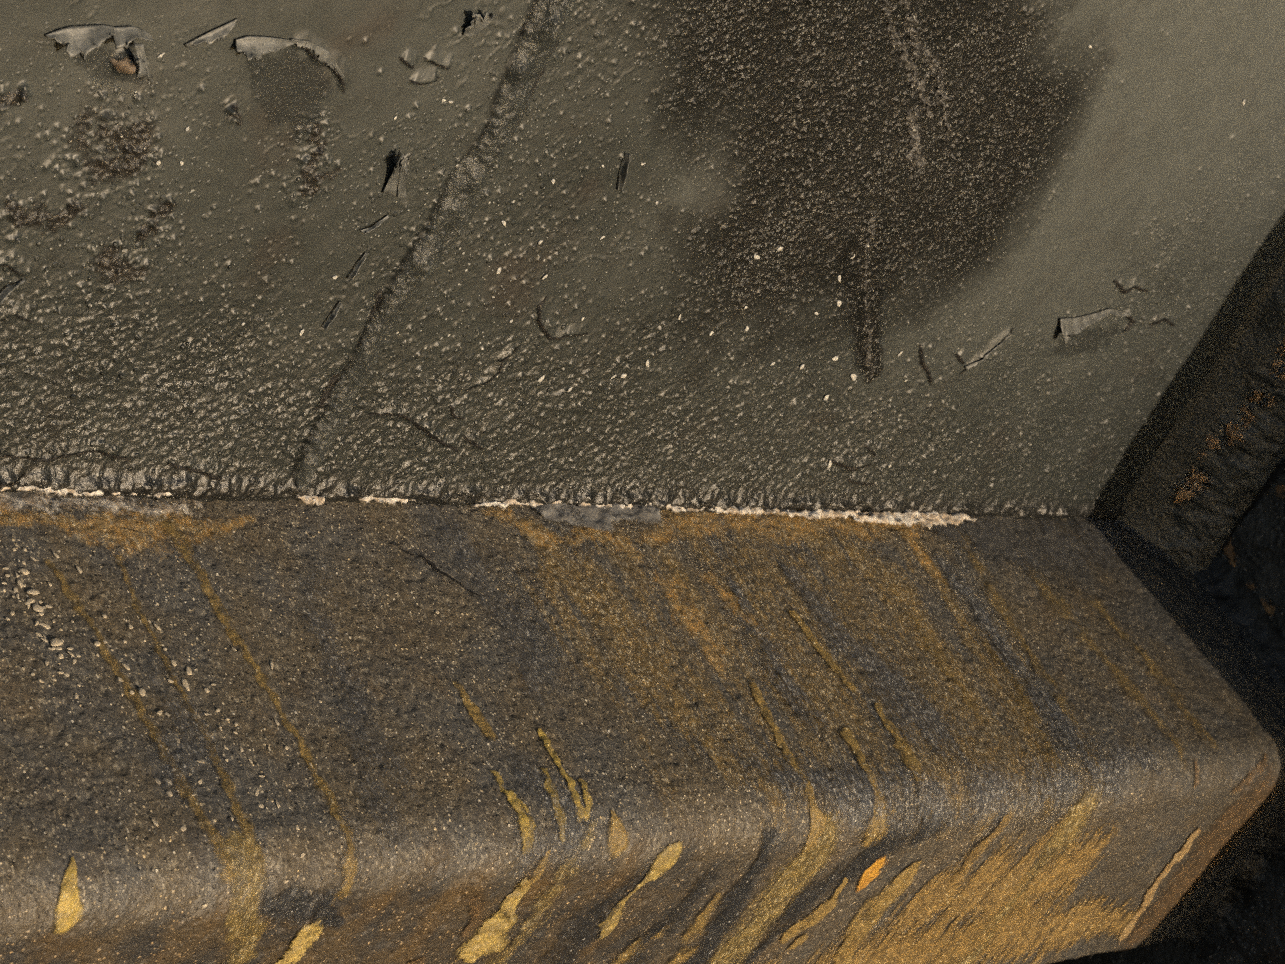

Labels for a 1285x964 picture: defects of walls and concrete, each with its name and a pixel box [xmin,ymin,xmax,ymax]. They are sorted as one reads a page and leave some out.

peeling [45,25,154,85]
peeling [185,18,345,79]
water stain [670,0,1083,383]
peeling [1060,308,1131,344]
rust [1174,390,1276,503]
water stain [0,486,172,498]
water stain [359,496,415,505]
water stain [473,498,562,509]
crack [384,541,481,597]
rust [0,503,358,964]
rust [485,510,1278,964]
rust [456,728,593,964]